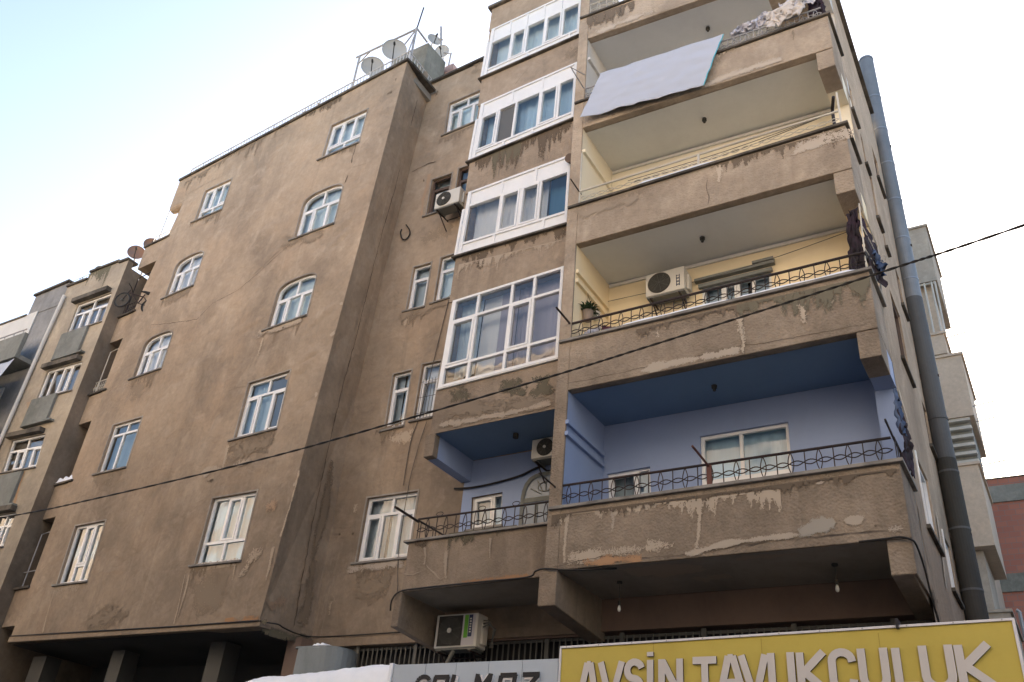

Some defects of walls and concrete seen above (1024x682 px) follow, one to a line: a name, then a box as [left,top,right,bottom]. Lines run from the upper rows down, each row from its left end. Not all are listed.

damp [475,122,572,179]
spalling [439,399,551,428]